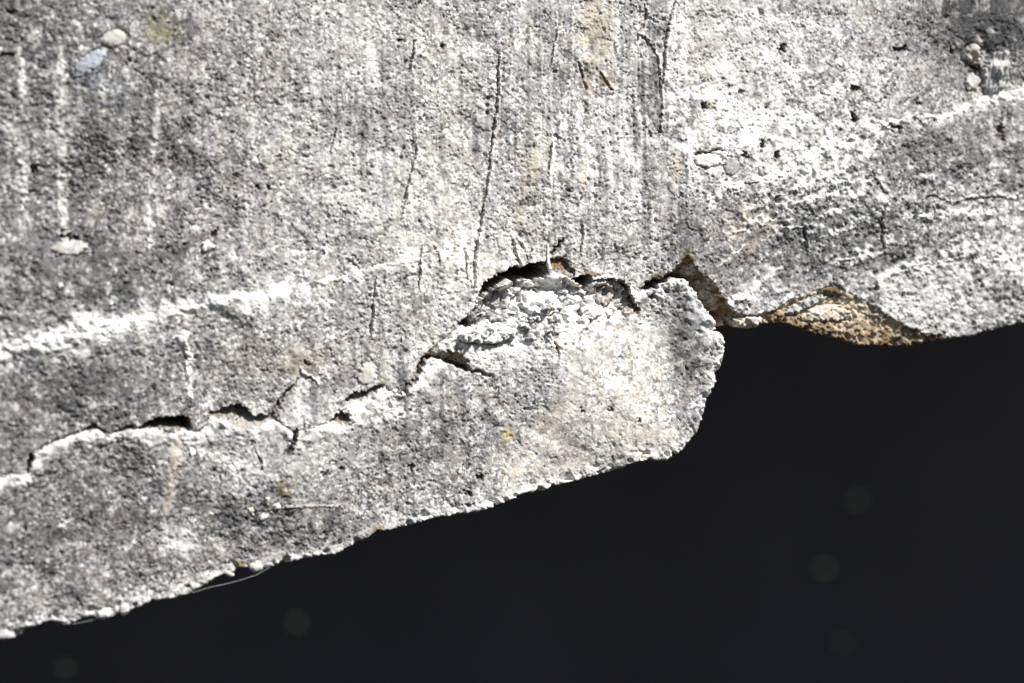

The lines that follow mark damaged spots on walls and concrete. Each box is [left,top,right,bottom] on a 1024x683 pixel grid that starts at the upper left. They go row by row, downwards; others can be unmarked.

crack [0,56,593,480]
spalling [0,275,947,638]
crack [640,250,742,329]